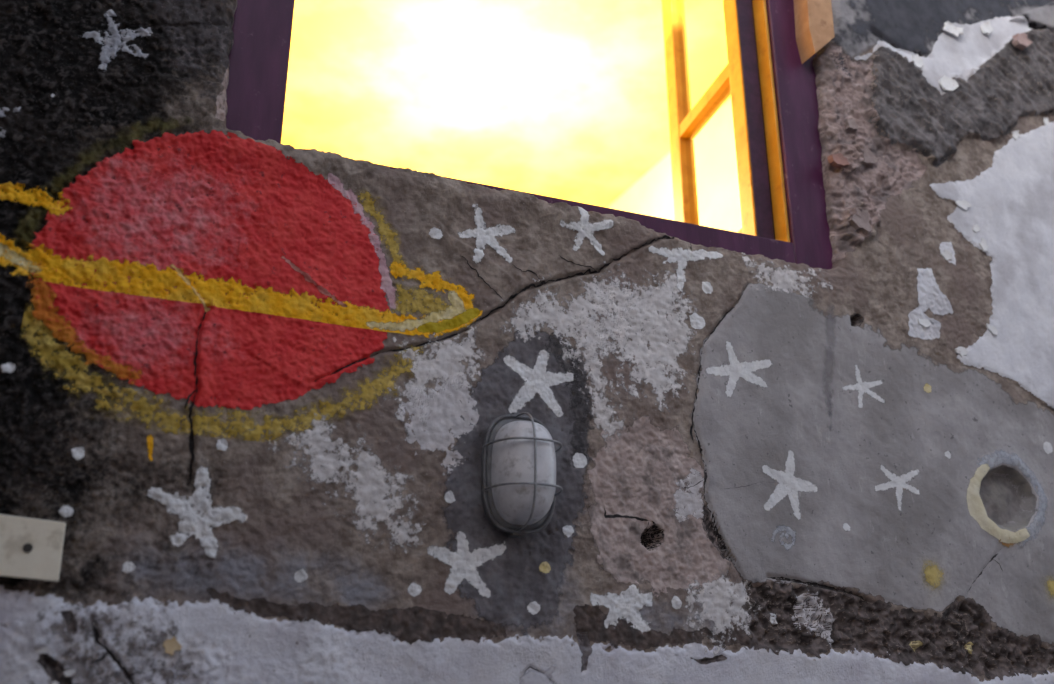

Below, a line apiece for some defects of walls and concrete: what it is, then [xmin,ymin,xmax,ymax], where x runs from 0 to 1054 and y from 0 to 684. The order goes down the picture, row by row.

crack [315,235,696,381]
peeling [742,253,833,299]
flaking render [813,16,1054,408]
crack [185,312,206,484]
flaking render [500,261,1054,680]
flaking render [35,597,201,684]